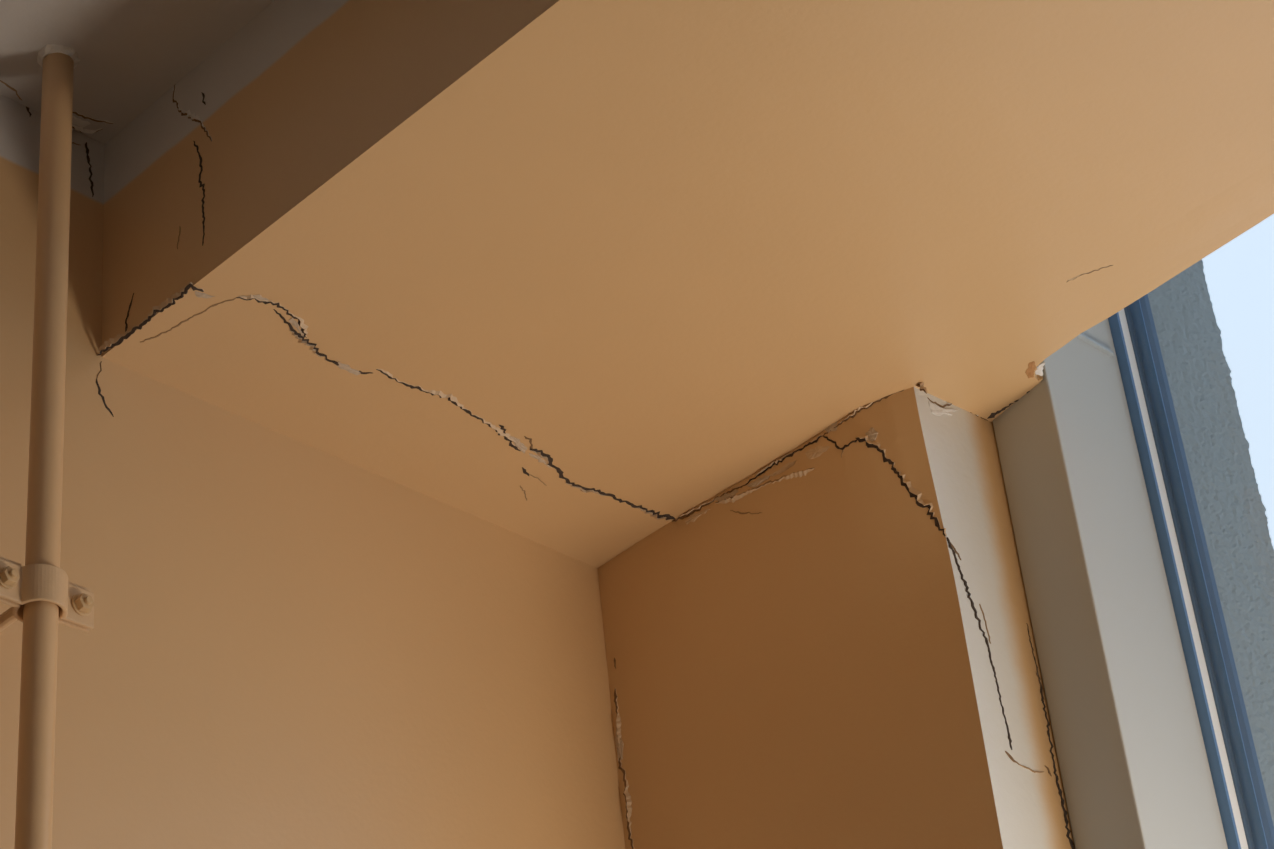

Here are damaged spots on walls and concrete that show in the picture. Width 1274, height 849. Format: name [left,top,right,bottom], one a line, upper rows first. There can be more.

crack [37,44,80,68]
crack [0,80,32,116]
crack [85,142,94,197]
crack [173,84,212,249]
crack [96,282,1074,849]